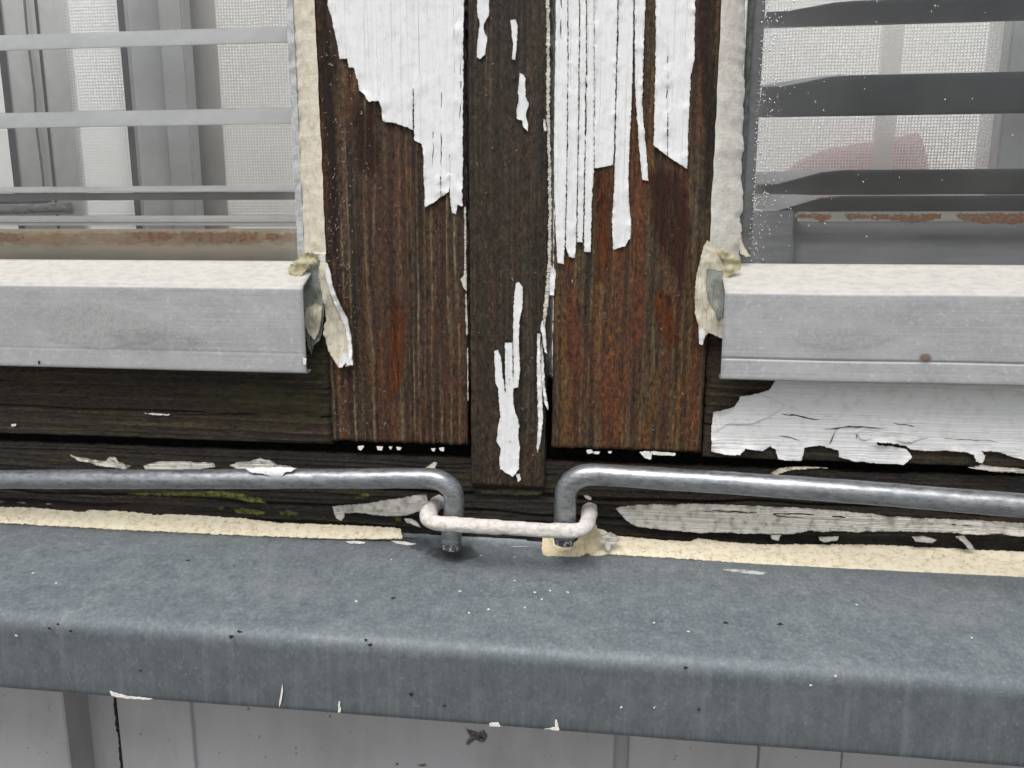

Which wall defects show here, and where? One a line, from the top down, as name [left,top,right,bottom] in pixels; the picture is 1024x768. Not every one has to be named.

peeling [477,0,489,59]
peeling [517,73,529,131]
peeling [327,0,468,335]
corrosion [0,232,297,245]
peeling [536,0,695,452]
corrosion [846,213,941,222]
corrosion [957,212,1024,224]
peeling [494,282,523,482]
crack [782,414,915,443]
peeling [711,381,1024,475]
peeling [332,495,428,528]
peeling [616,503,1024,550]